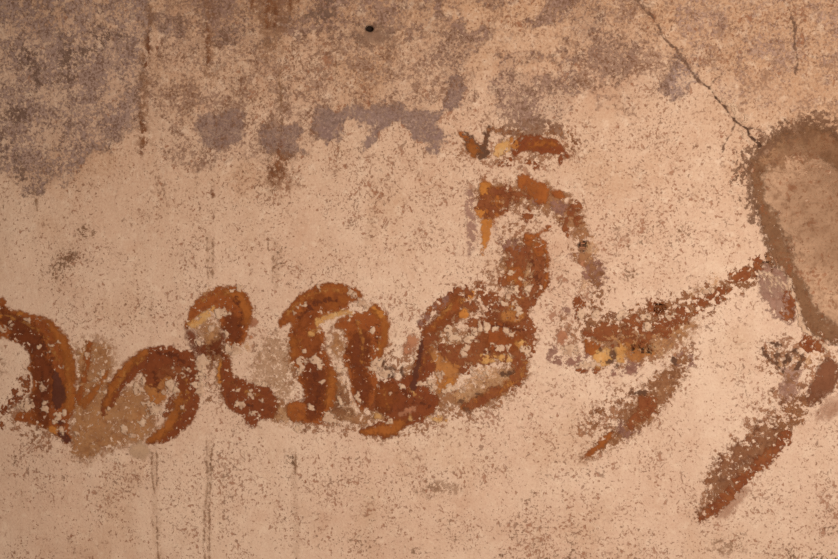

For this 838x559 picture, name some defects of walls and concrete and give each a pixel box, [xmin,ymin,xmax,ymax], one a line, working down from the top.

crack [637,0,764,151]